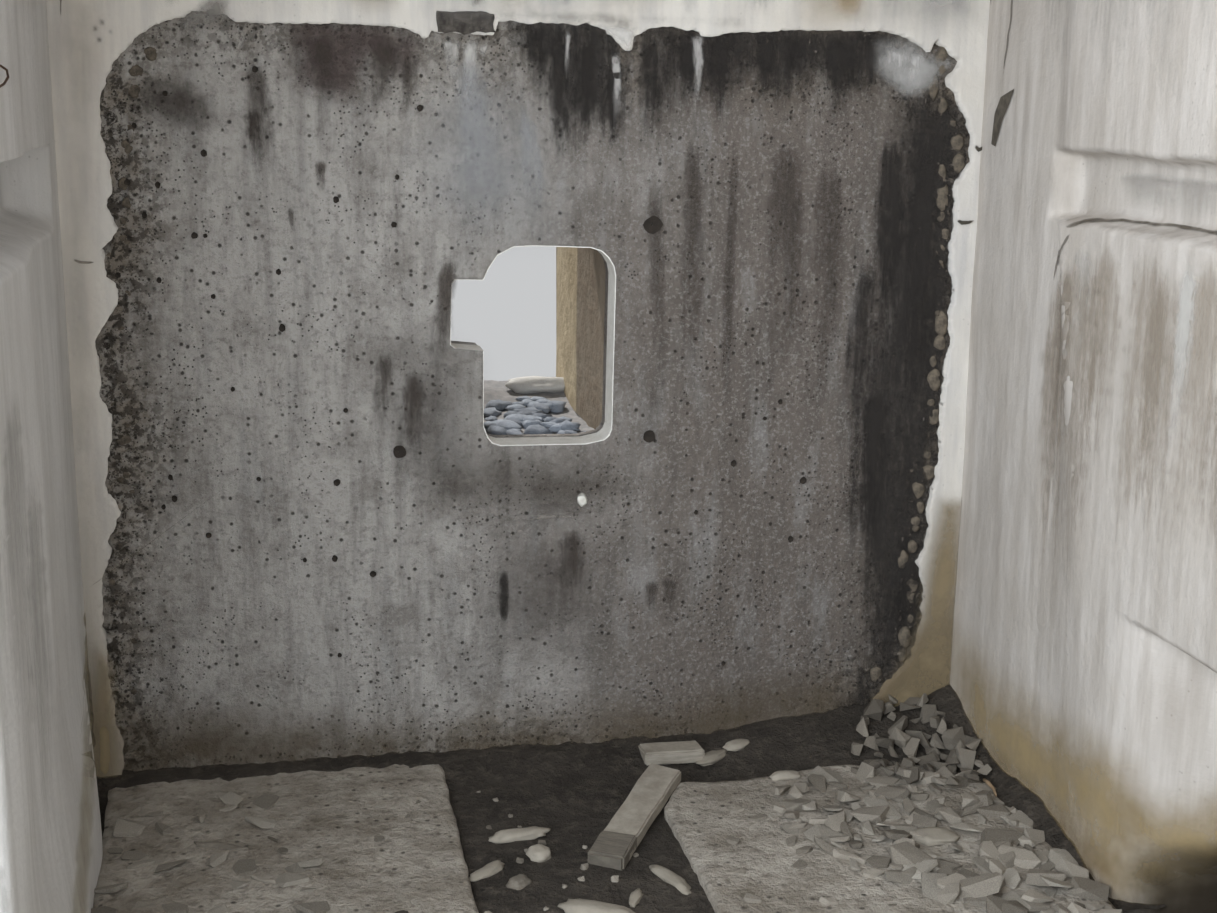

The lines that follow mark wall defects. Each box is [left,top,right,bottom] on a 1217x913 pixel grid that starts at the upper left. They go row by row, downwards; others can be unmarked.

leakage [248,72,266,137]
leakage [294,23,413,94]
leakage [445,42,486,82]
leakage [517,22,625,136]
leakage [439,265,455,334]
leakage [380,360,390,395]
leakage [405,377,421,434]
spalling [95,11,970,772]
leakage [642,27,967,705]
leakage [1137,278,1213,406]
leakage [500,574,508,618]